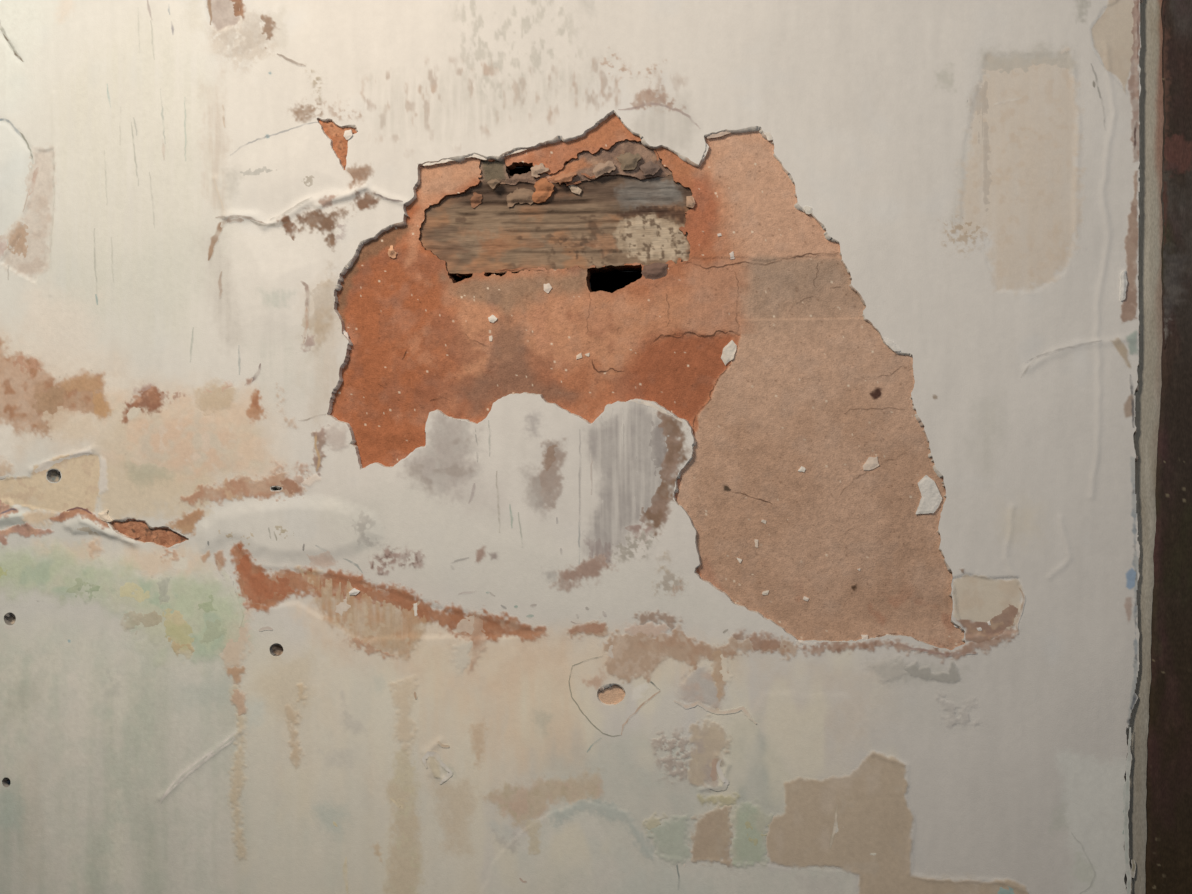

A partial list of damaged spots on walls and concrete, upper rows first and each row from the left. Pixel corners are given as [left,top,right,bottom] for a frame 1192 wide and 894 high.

spalling [0,113,1026,724]
leakage [367,670,657,894]